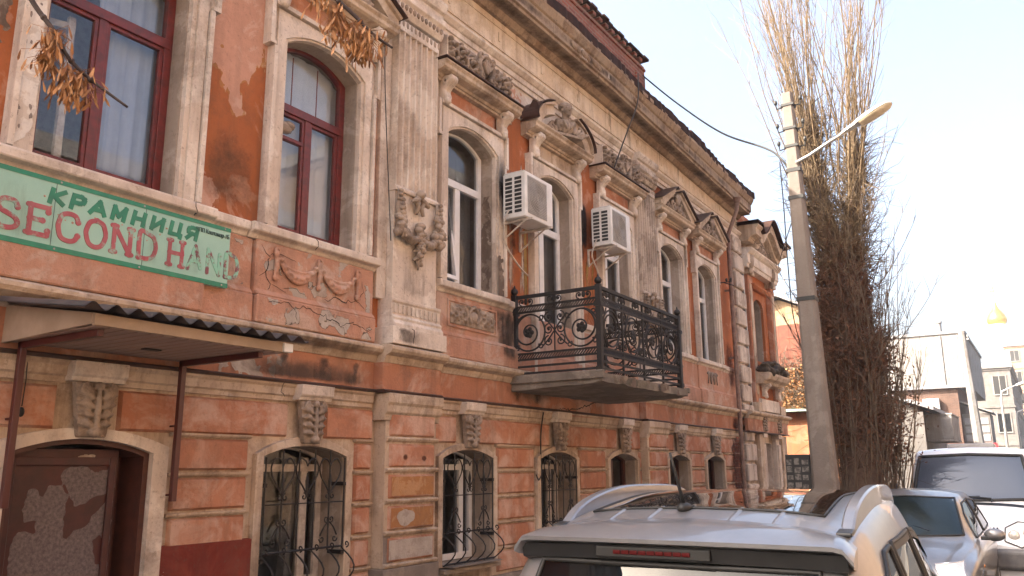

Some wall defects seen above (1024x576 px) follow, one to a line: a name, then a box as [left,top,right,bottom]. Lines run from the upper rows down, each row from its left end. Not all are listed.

peeling [212,0,268,118]
spalling [266,281,350,336]
crack [259,239,369,332]
damp [256,328,357,383]